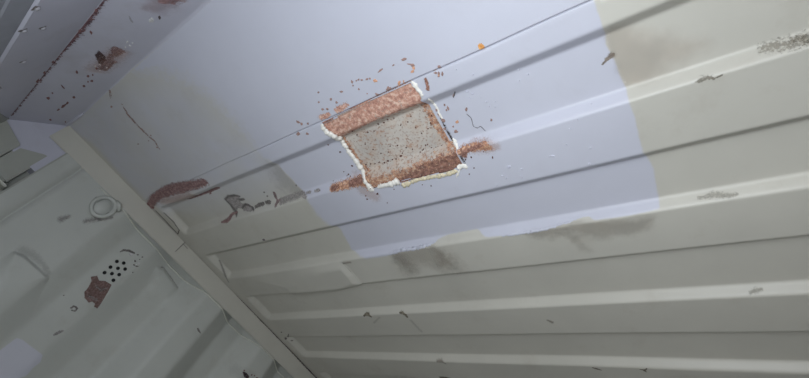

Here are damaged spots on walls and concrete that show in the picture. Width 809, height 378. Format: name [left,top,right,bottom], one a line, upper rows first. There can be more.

rust [11,0,107,116]
rust [317,58,495,200]
rust [147,178,220,209]
peeling [221,185,320,224]